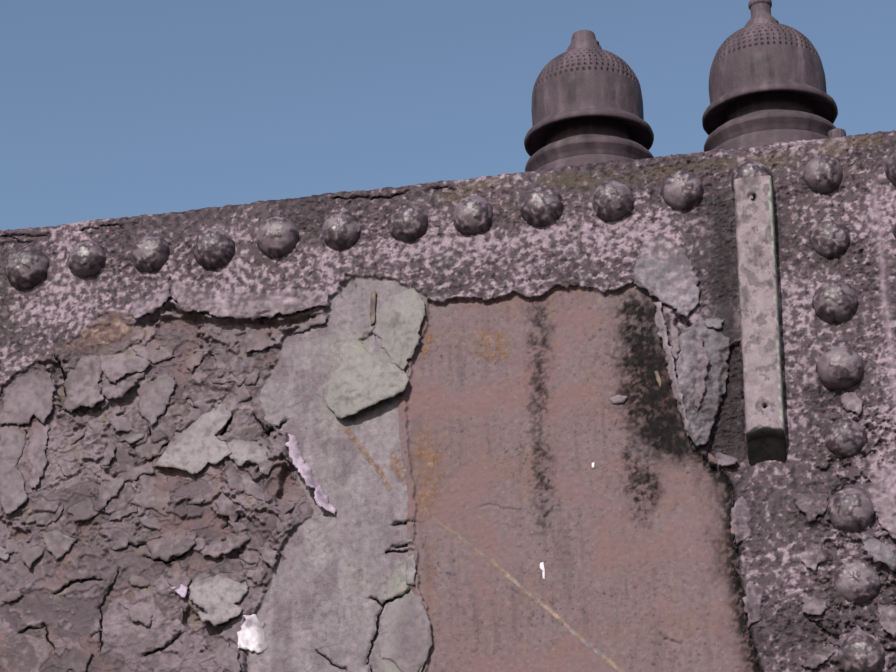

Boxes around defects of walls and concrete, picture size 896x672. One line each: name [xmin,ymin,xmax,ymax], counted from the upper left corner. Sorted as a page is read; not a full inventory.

peeling [130,280,330,353]
peeling [323,288,426,419]
leakage [619,299,690,460]
peeling [633,235,730,447]
peeling [0,340,296,672]
crack [385,520,413,554]
rust [391,283,761,672]
leakage [626,455,659,510]
peeling [860,451,896,572]
crack [53,570,119,652]
crack [144,633,182,656]
crack [317,589,411,672]